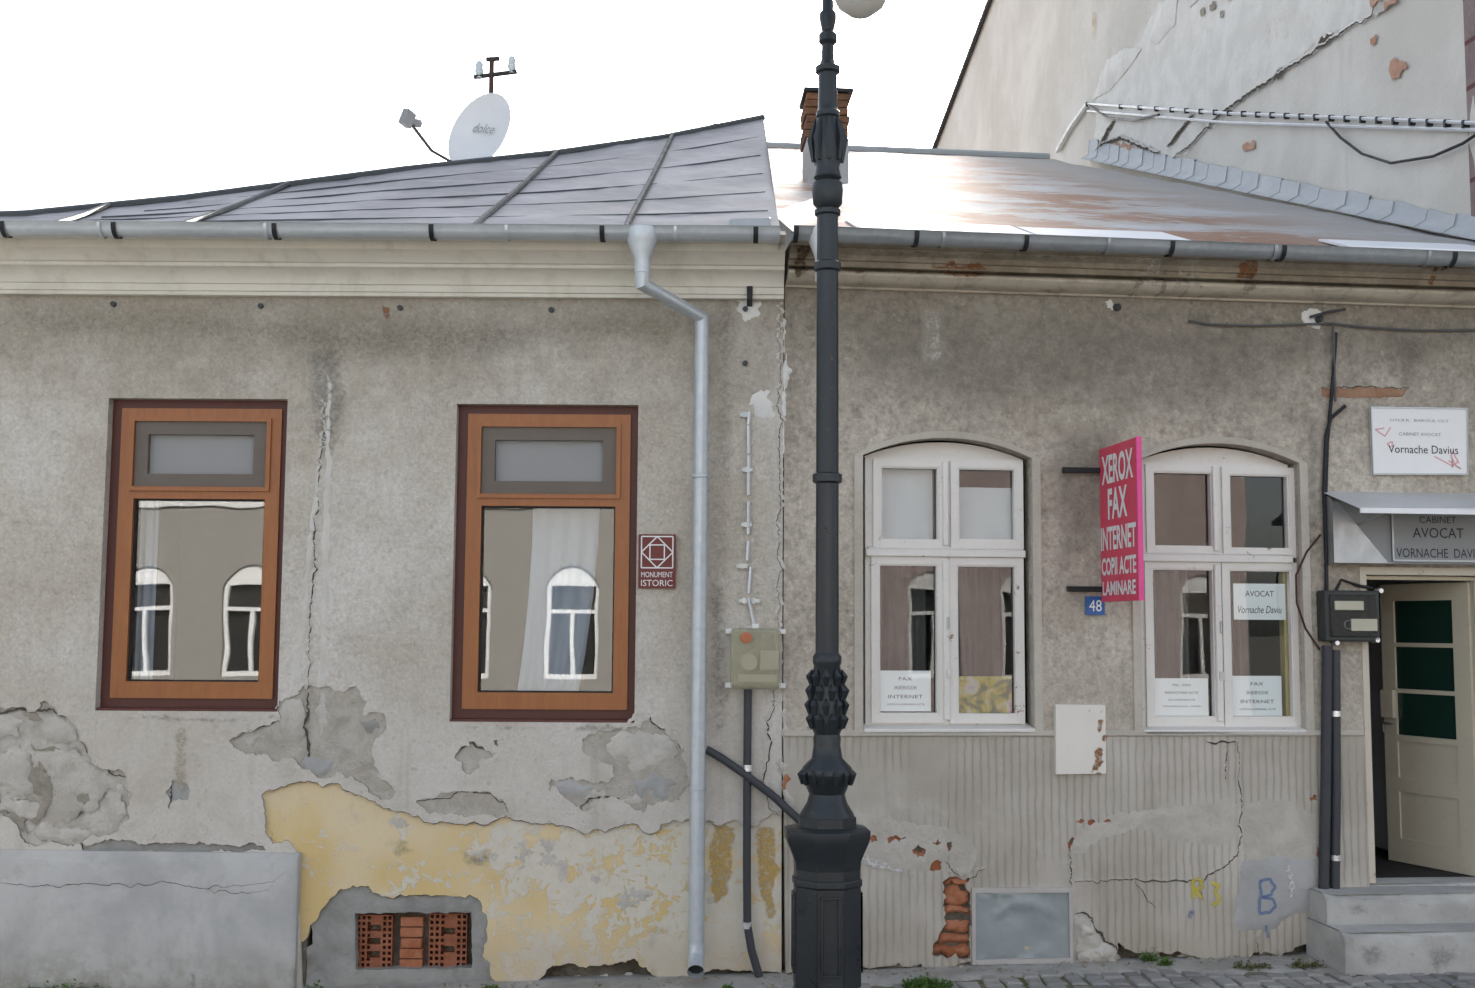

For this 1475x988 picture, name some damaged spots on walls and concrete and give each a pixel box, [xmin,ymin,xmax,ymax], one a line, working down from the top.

flaking render [1092,0,1396,157]
flaking render [1389,57,1407,80]
crack [289,374,333,690]
crack [759,302,794,816]
flaking render [0,701,133,846]
peeling [230,684,782,981]
flaking render [870,835,970,958]
crack [1066,737,1245,907]